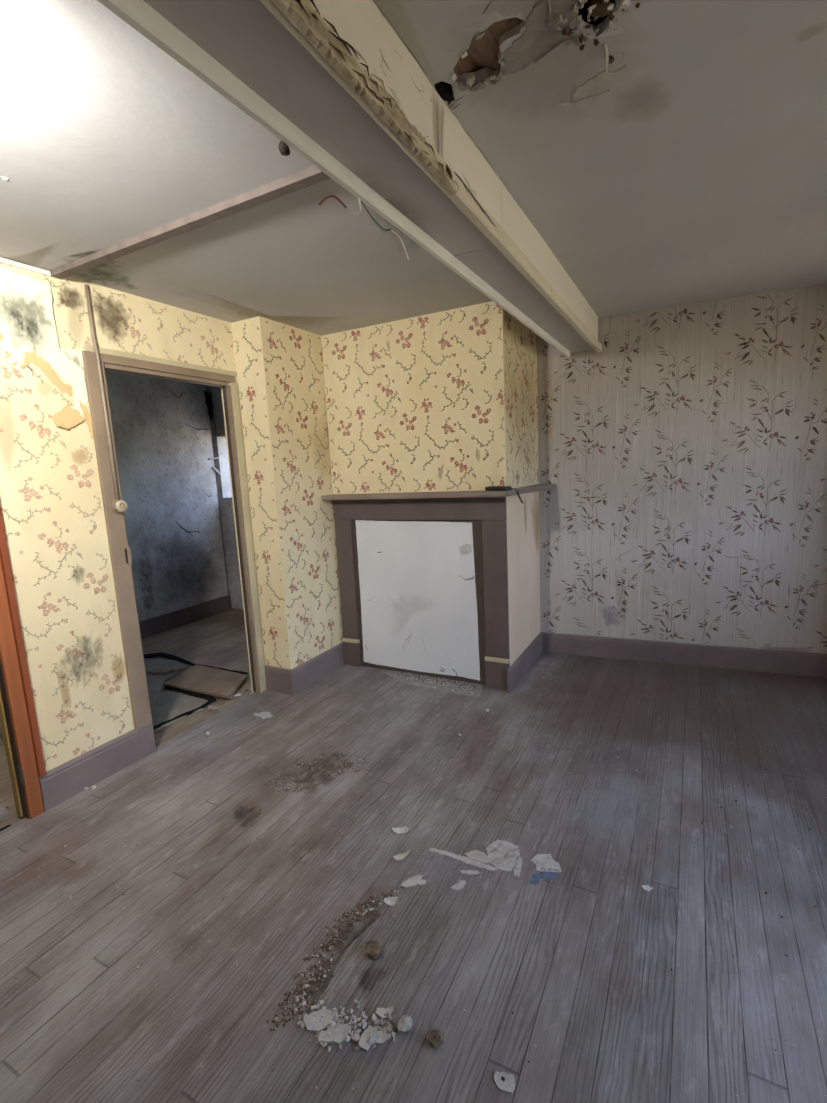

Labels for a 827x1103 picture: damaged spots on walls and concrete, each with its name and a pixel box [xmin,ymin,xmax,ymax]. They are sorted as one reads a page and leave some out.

spalling [555,0,640,51]
spalling [270,0,460,195]
crack [373,0,533,225]
leakage [98,302,124,334]
peeling [52,405,84,430]